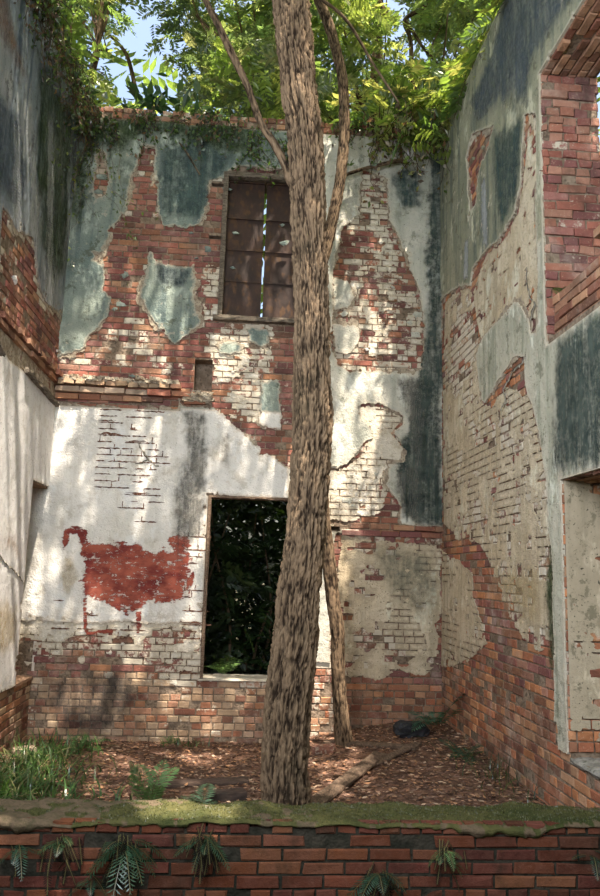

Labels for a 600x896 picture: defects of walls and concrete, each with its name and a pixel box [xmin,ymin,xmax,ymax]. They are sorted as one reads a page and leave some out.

damp [0,101,54,307]
spalling [0,145,294,523]
damp [157,265,189,286]
damp [162,141,227,216]
damp [392,157,443,526]
peeling [328,113,555,711]
damp [554,315,600,468]
crack [0,555,24,584]
peeling [19,585,211,685]